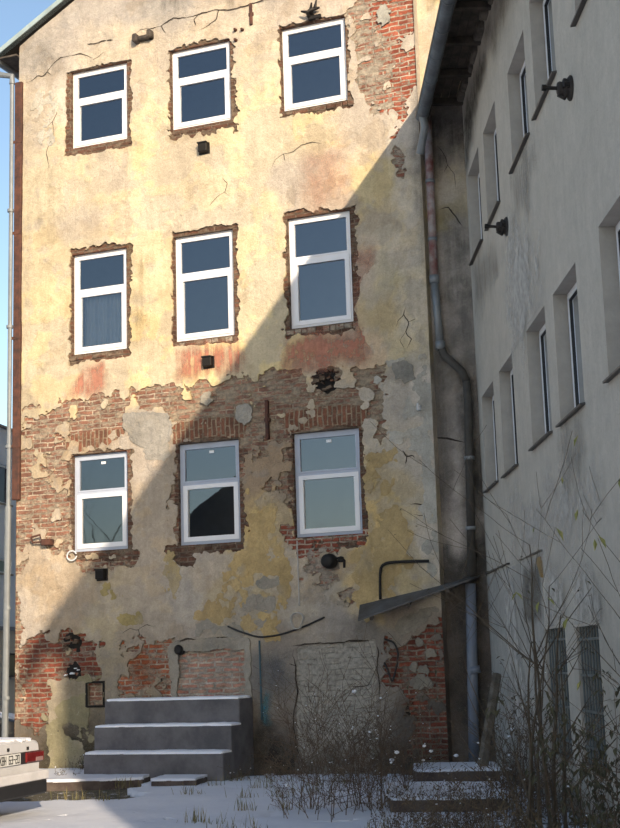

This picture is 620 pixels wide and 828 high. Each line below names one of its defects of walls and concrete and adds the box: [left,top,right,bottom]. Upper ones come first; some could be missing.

crack [29,39,111,82]
crack [139,0,263,32]
flaking render [344,0,417,179]
flaking render [17,353,439,642]
flaking render [16,591,106,769]
flaking render [118,636,179,698]
flaking render [381,617,449,763]